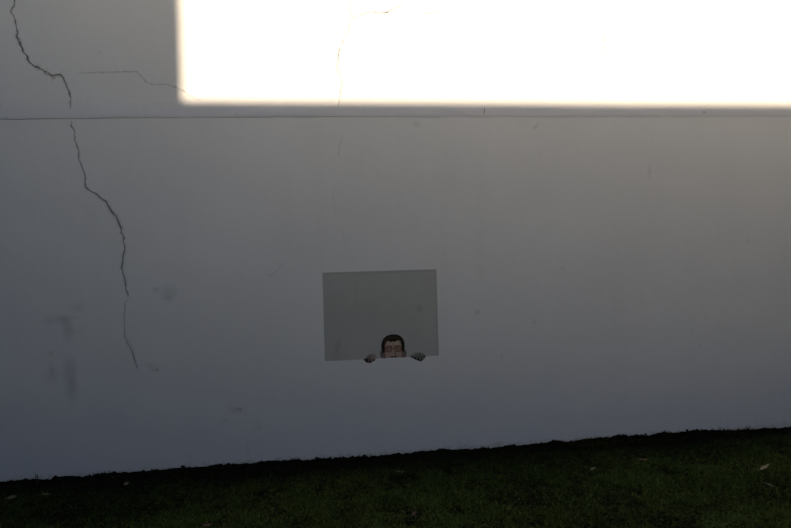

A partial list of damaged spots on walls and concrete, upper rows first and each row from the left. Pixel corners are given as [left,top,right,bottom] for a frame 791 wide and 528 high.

crack [10,0,128,294]